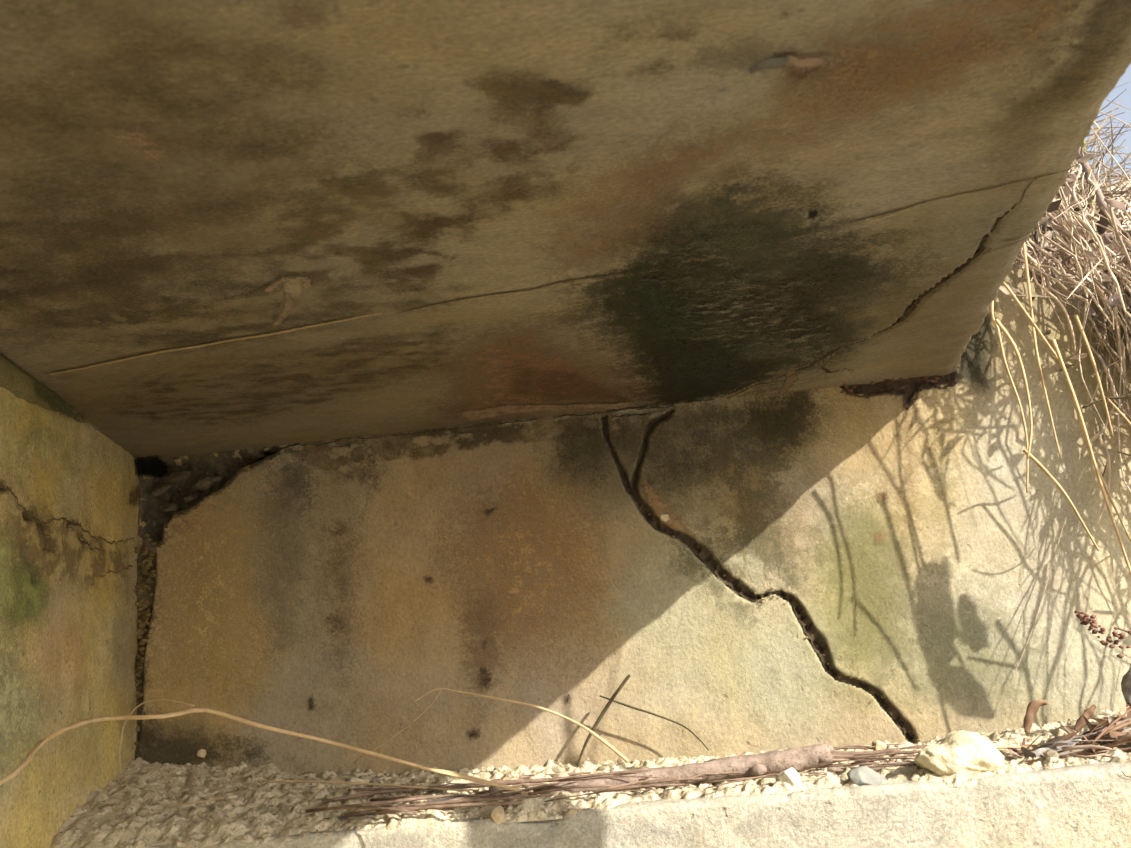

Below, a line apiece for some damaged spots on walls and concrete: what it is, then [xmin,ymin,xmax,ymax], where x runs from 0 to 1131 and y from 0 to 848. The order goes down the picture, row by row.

water stain [480,76,588,162]
water stain [0,130,472,347]
crack [396,265,657,314]
crack [718,167,1076,398]
crack [0,482,134,577]
crack [269,404,921,742]
water stain [729,473,797,585]